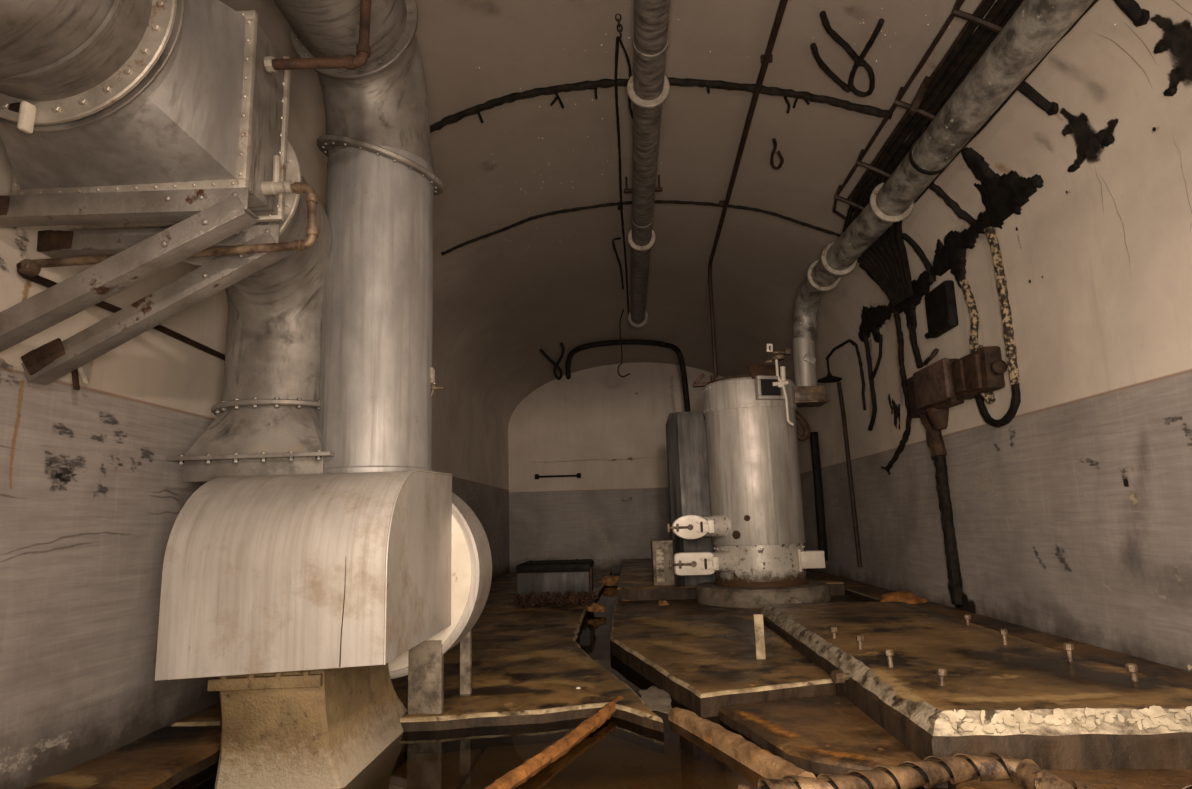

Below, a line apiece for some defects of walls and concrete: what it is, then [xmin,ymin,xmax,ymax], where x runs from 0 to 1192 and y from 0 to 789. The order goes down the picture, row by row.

corrosion [10,380,24,488]
peeling [91,414,127,443]
peeling [45,451,85,490]
peeling [941,705,1192,734]